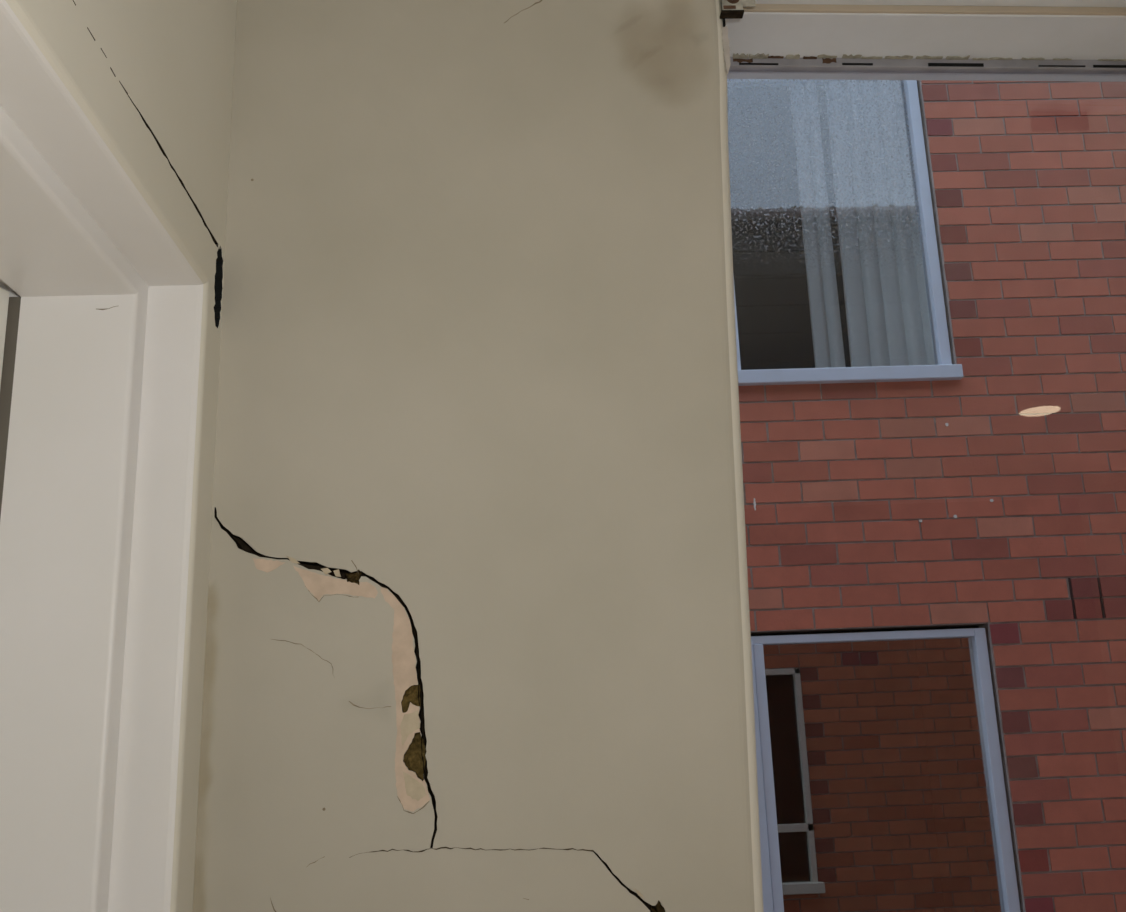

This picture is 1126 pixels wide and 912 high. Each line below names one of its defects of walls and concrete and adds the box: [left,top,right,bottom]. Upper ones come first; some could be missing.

crack [73,0,223,328]
crack [215,508,665,912]